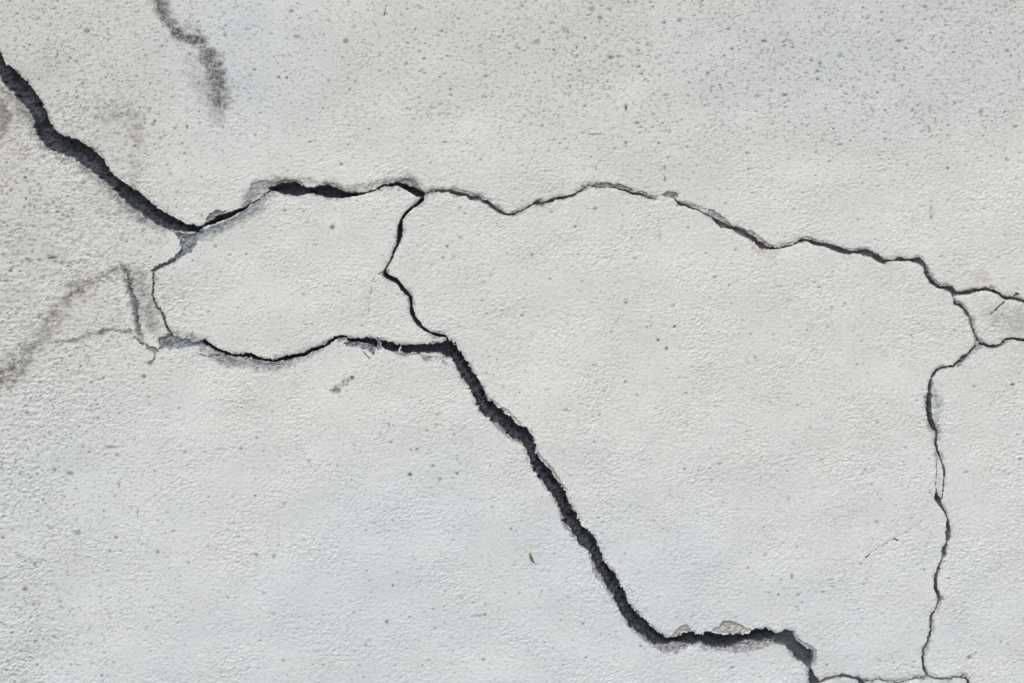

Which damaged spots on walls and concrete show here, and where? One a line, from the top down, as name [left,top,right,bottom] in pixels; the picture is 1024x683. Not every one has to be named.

crack [0,51,656,363]
crack [671,196,1024,348]
crack [448,340,976,683]